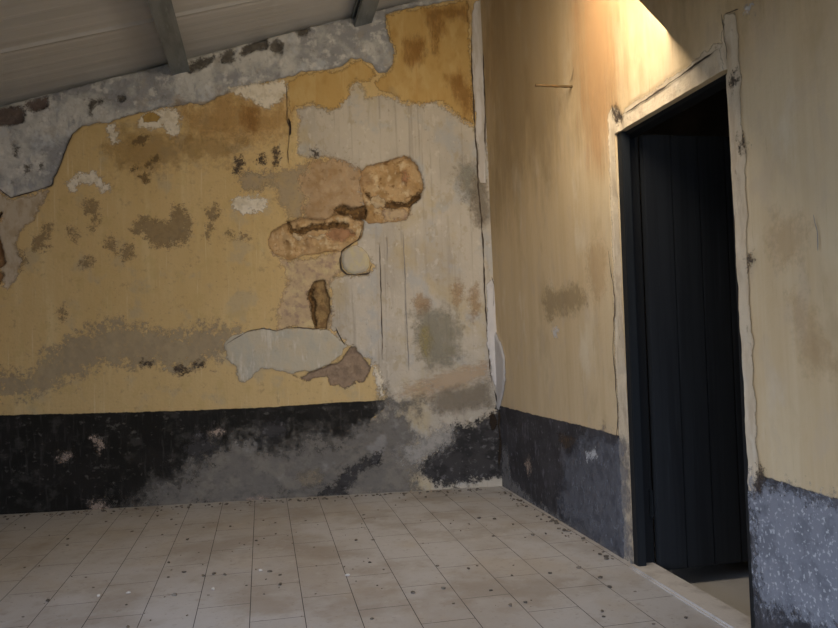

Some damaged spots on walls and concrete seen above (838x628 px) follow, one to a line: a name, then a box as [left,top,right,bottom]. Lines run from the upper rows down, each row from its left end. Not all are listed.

leakage [0,316,241,403]
flaking render [0,0,454,290]
peeling [130,0,562,521]
peeling [556,13,838,628]